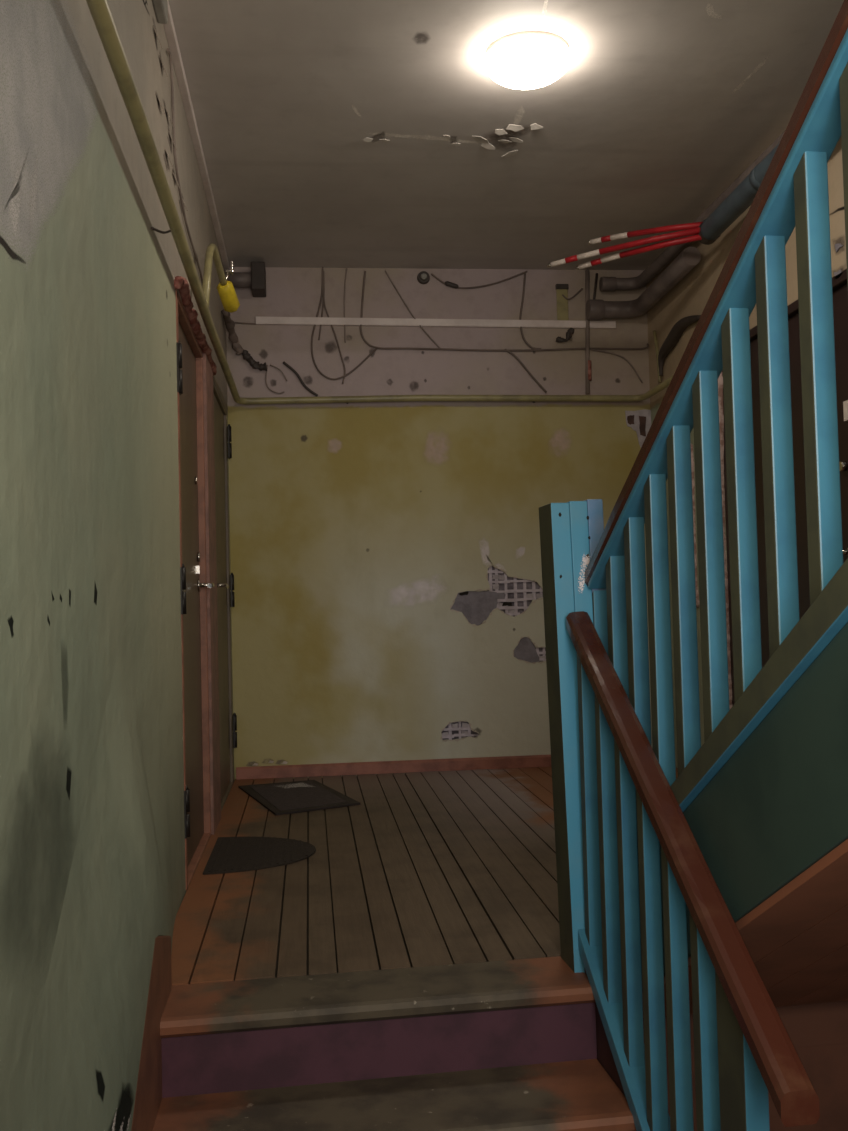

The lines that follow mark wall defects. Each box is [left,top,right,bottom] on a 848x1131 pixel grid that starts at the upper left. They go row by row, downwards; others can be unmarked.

spalling [443,123,543,157]
spalling [450,565,543,626]
spalling [513,636,546,664]
spalling [441,720,480,742]